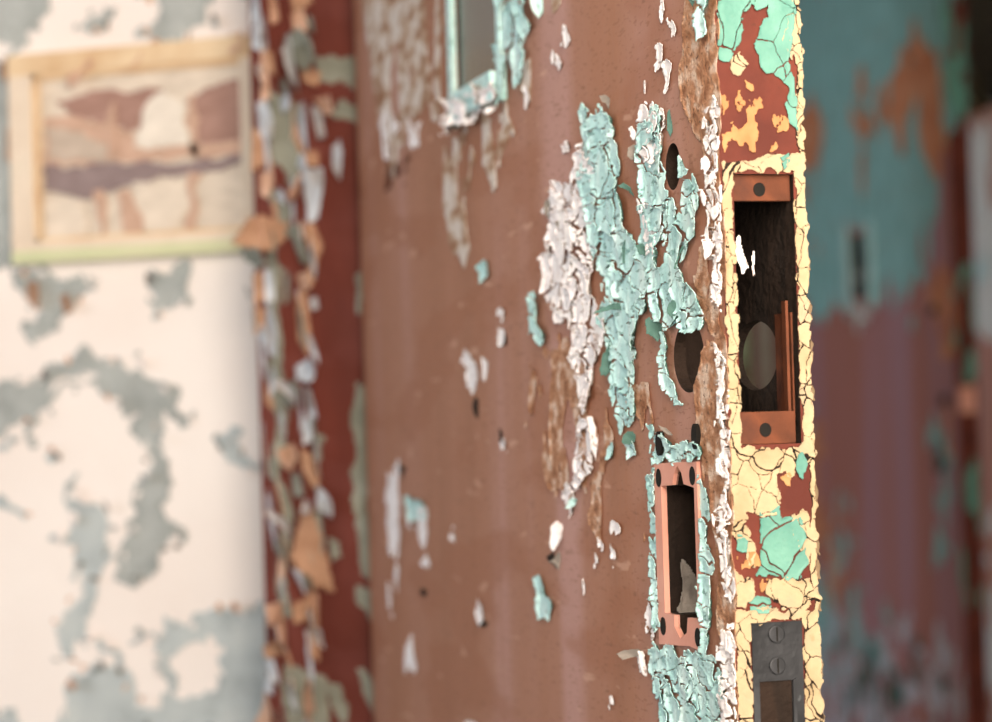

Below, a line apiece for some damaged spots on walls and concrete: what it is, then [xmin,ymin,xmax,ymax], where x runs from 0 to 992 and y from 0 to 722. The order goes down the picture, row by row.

peeling [363,0,561,283]
peeling [0,0,357,722]
peeling [460,349,488,419]
peeling [496,307,507,347]
peeling [524,0,992,722]
peeling [350,383,371,621]
peeling [357,668,374,712]
peeling [385,459,430,619]
peeling [404,634,417,674]
peeling [475,599,488,628]